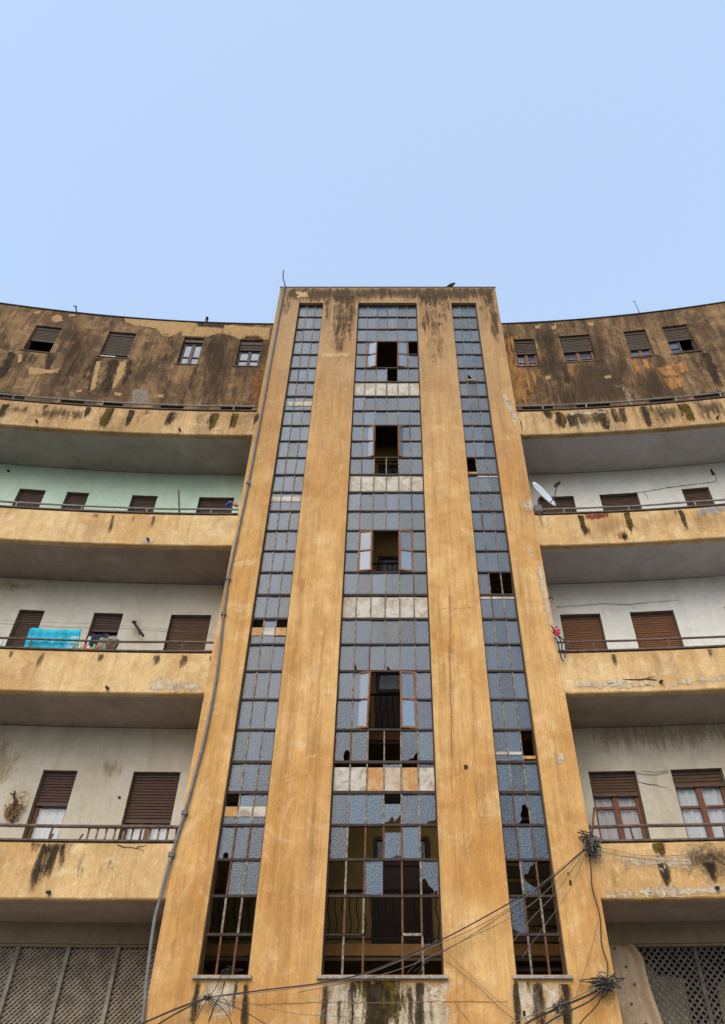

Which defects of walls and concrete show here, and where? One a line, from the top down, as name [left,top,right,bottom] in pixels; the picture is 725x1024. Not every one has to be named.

damp [282,288,499,358]
damp [0,332,142,392]
peeling [75,361,101,393]
peeling [112,361,127,396]
damp [188,323,234,401]
damp [537,329,724,429]
spalling [656,362,688,390]
damp [207,413,239,430]
damp [30,843,71,886]
damp [652,843,670,886]
peeling [606,851,725,898]
damp [320,981,432,1024]